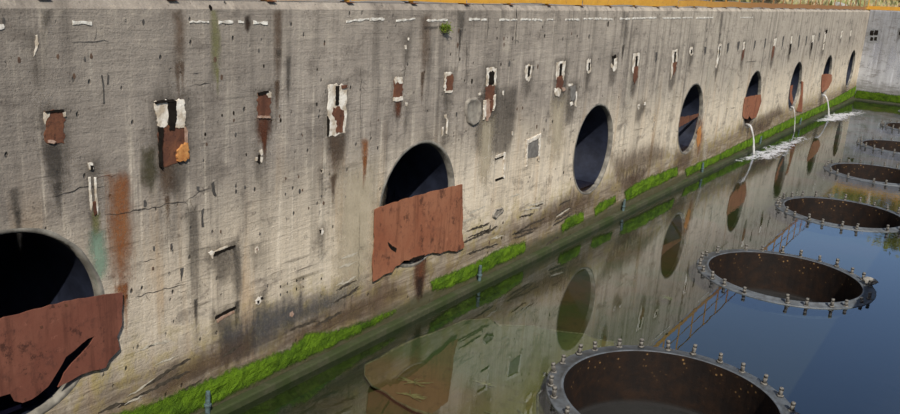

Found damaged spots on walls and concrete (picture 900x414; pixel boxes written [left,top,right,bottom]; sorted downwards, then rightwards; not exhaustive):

corrosion [258,118,269,146]
leakage [331,138,343,186]
crack [112,188,209,215]
corrosion [111,176,129,307]
leakage [163,170,375,388]
corrosion [415,259,426,296]